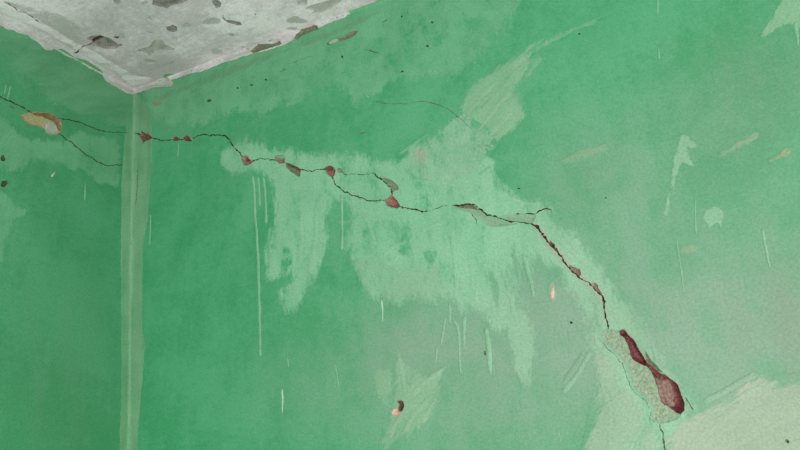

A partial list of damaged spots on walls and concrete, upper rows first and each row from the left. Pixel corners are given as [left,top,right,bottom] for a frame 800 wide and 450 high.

flaking render [20,112,62,135]
crack [59,118,276,206]
flaking render [382,178,400,209]
crack [300,168,666,450]
flaking render [392,400,404,416]
flaking render [599,328,685,424]